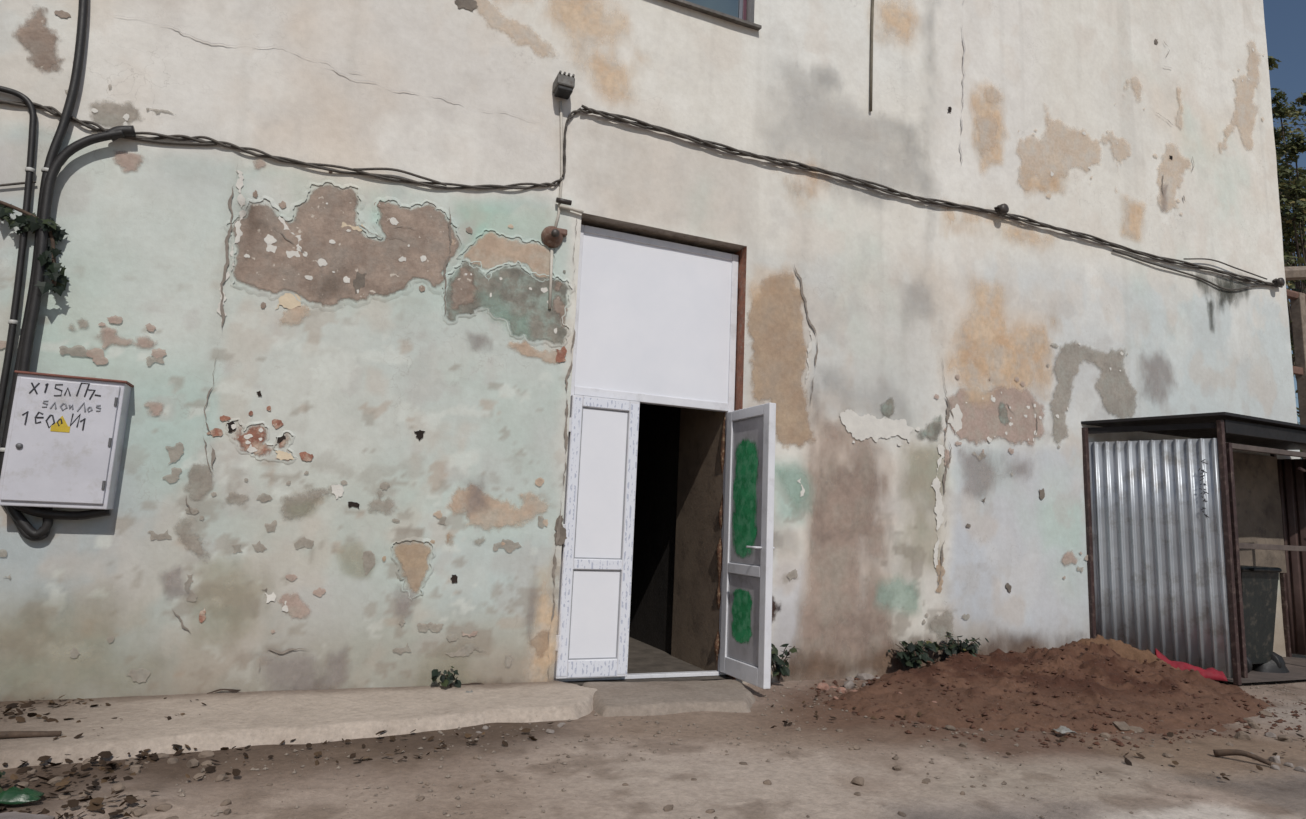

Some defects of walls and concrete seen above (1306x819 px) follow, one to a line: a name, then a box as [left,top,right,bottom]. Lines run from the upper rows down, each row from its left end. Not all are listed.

peeling [15,8,71,71]
peeling [455,0,551,56]
peeling [973,88,1130,198]
peeling [1124,144,1194,238]
peeling [59,315,167,366]
crack [203,170,247,475]
flaking render [223,171,574,363]
peeling [748,265,818,446]
flaking render [839,342,1137,460]
leakage [1197,275,1248,328]
peeling [148,406,400,555]
peeling [362,477,548,602]